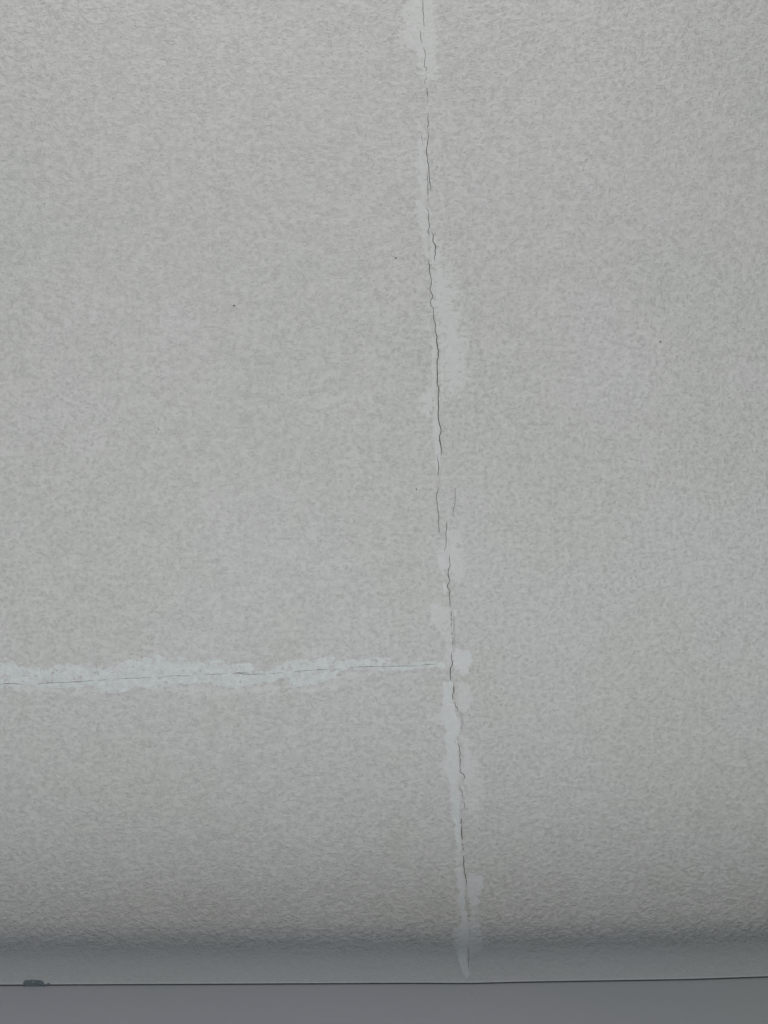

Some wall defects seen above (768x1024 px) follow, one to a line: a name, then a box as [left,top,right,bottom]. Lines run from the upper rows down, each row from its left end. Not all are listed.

crack [418,13,470,970]